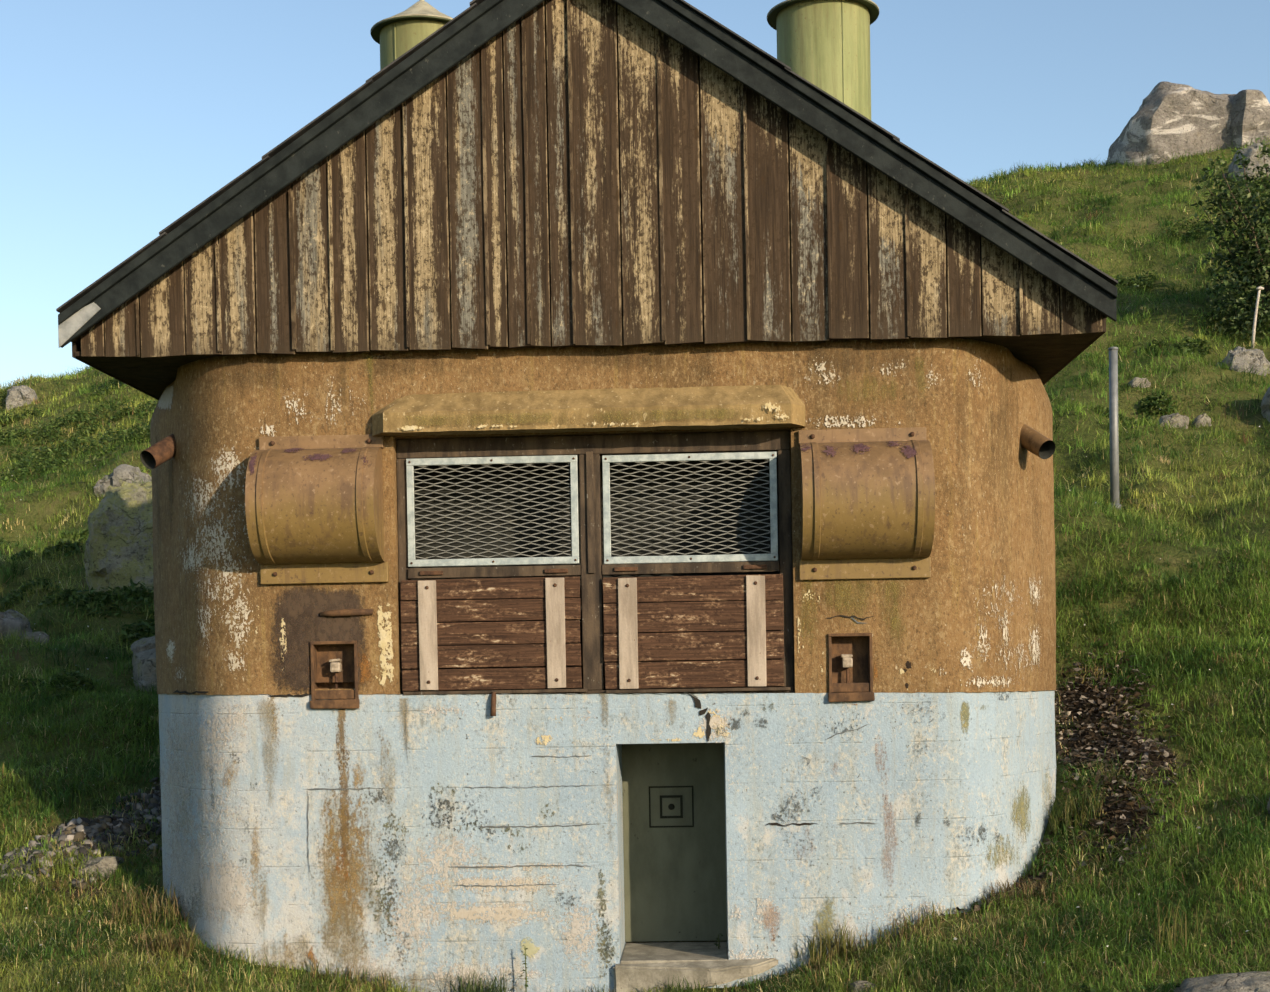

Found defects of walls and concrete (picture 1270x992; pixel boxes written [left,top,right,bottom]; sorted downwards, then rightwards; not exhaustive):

peeling [176,445,259,673]
peeling [284,447,368,464]
crack [685,693,711,741]
peeling [931,576,1044,689]
rust [318,709,369,962]
leakage [365,783,530,992]